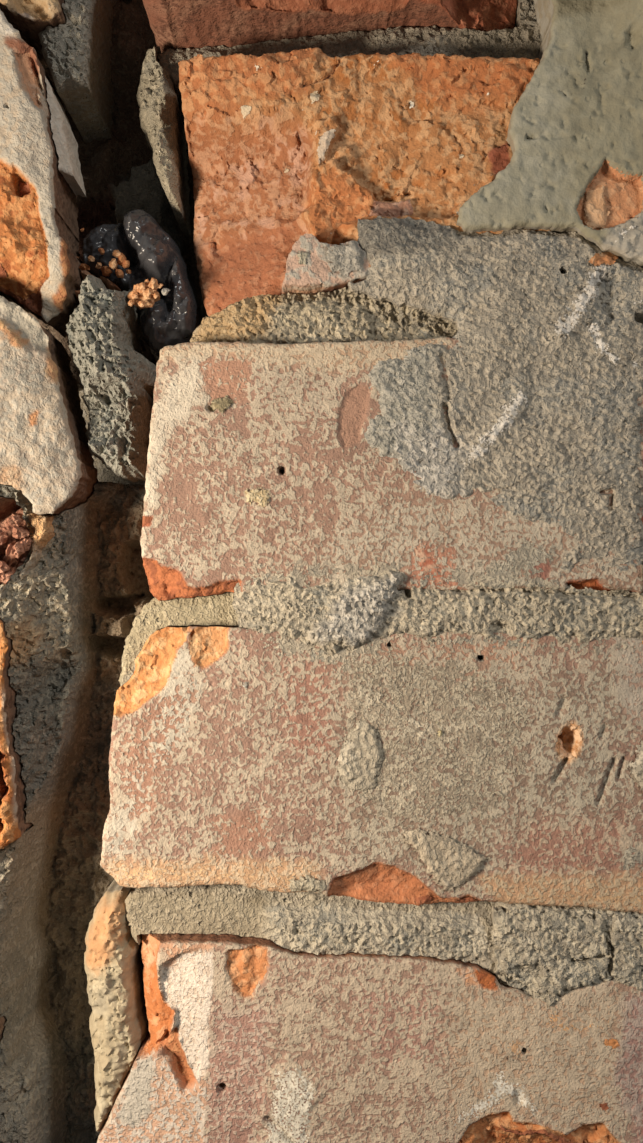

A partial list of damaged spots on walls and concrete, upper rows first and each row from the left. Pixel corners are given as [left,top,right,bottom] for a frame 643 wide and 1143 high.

spalling [436,0,517,32]
spalling [576,153,643,230]
spalling [589,251,618,266]
spalling [142,558,240,599]
spalling [114,627,228,716]
crack [0,751,9,829]
spalling [328,864,489,905]
spalling [141,933,174,1055]
spalling [227,946,267,999]
spalling [459,1103,618,1143]